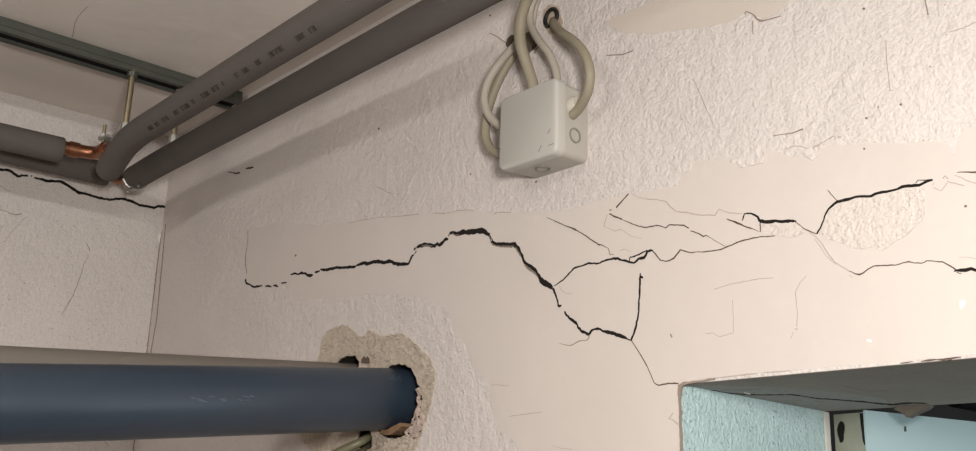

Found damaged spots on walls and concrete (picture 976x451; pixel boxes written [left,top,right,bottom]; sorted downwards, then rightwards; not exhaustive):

crack [0,168,166,353]
crack [245,171,976,386]
peeling [300,325,436,451]
crack [712,370,927,405]